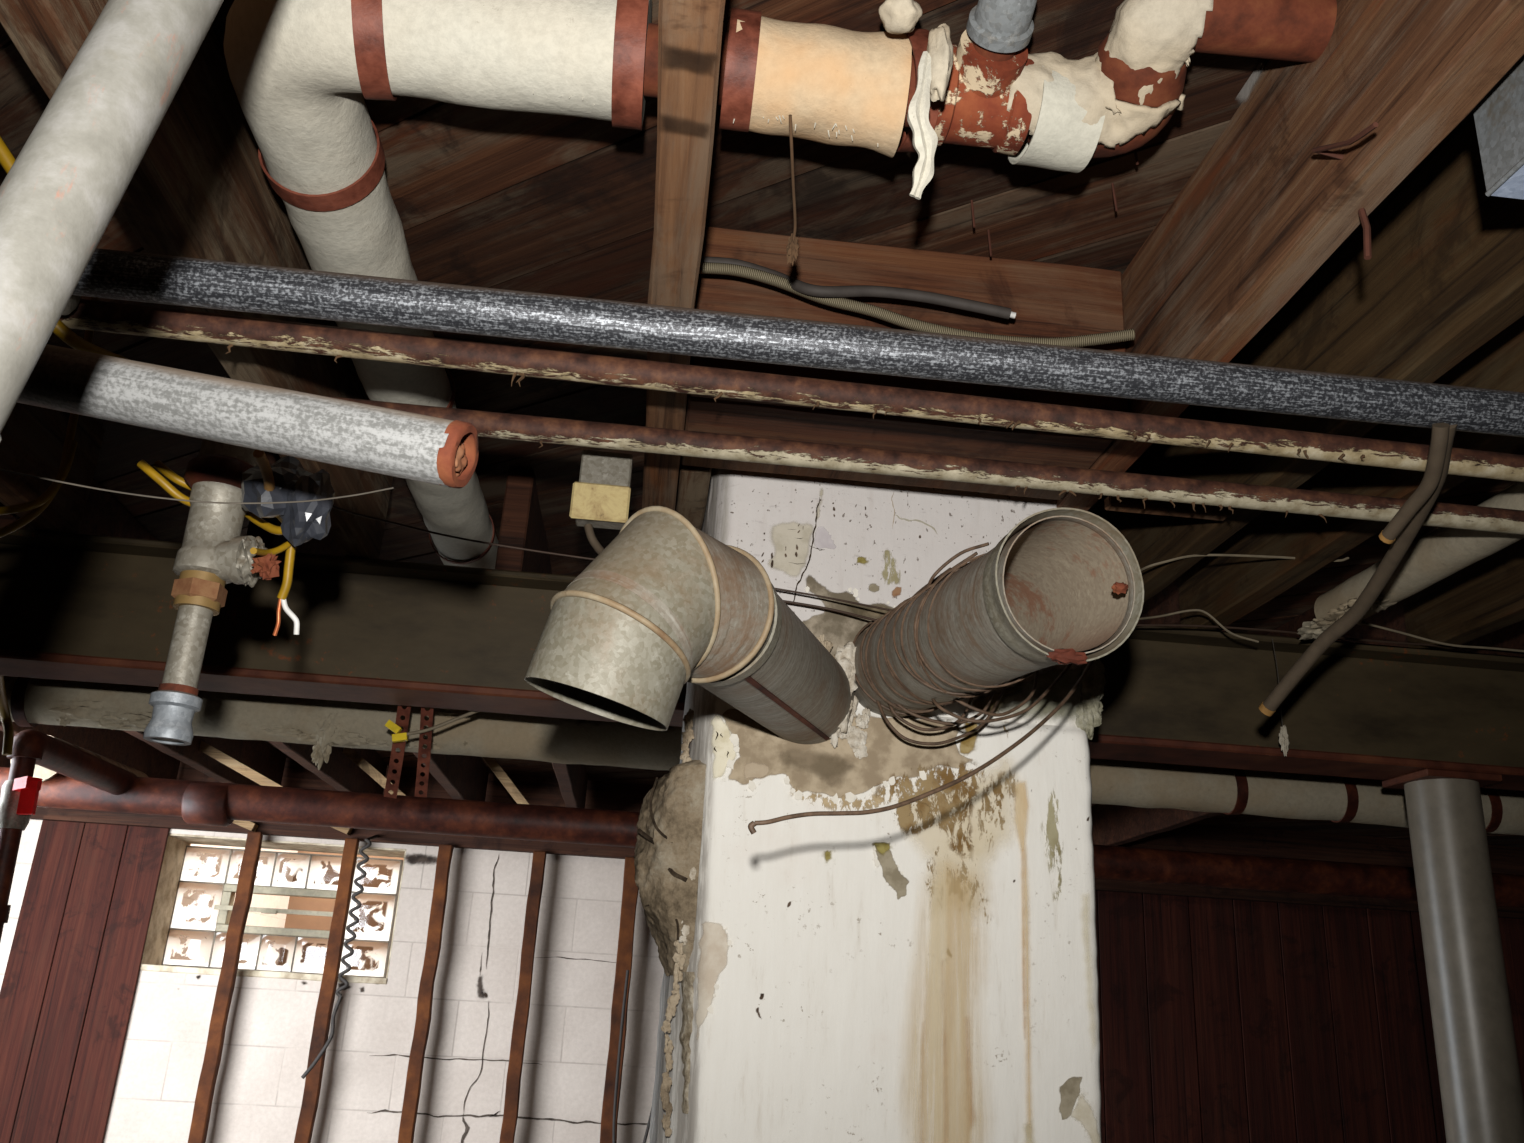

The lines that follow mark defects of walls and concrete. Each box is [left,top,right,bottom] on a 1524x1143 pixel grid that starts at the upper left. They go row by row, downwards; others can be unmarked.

peeling [762,499,895,655]
spalling [680,709,694,763]
peeling [722,709,972,804]
peeling [873,843,909,899]
water stain [877,763,1011,906]
peeling [927,850,988,923]
peeling [979,773,1017,842]
crack [373,855,648,1143]
spalling [660,922,732,1137]
peeling [1059,1077,1101,1143]